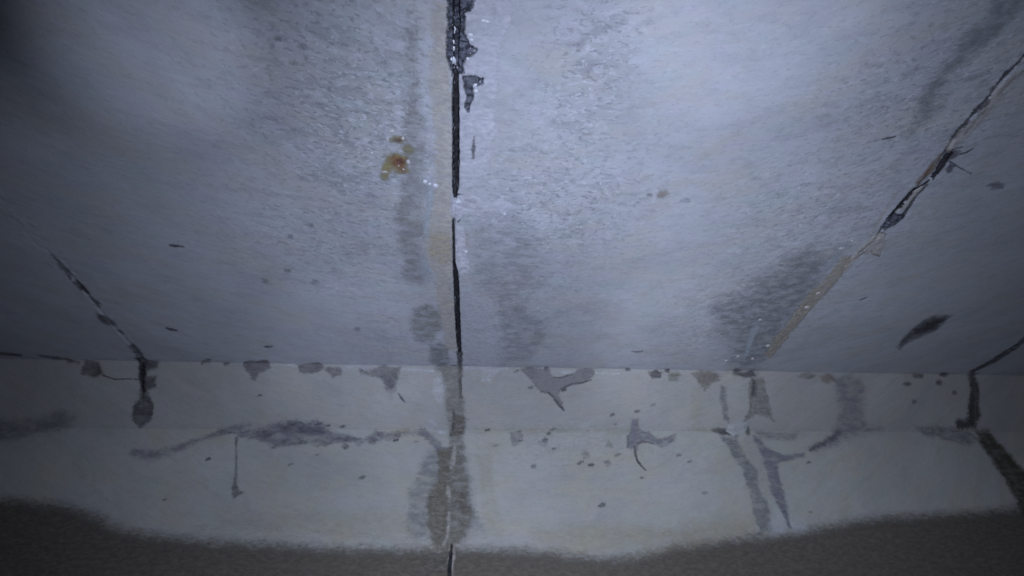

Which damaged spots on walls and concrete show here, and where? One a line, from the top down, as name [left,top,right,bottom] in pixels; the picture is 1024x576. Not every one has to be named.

damp [432,26,456,97]
spalling [446,0,484,112]
corrosion [381,137,408,179]
crack [450,0,463,436]
damp [423,106,514,321]
crack [857,54,1024,254]
crack [58,261,113,325]
peeling [524,367,595,411]
crack [957,338,1024,428]
damp [0,326,1024,576]